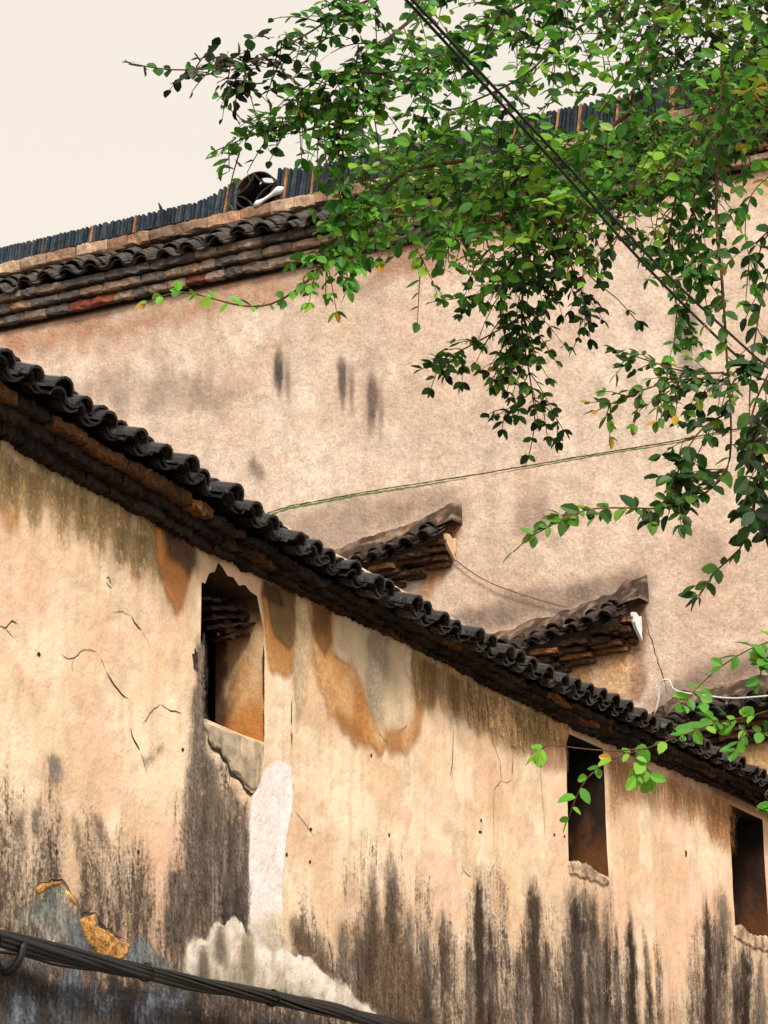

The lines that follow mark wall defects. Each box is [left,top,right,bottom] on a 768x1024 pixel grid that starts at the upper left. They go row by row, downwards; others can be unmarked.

damp [274,351,290,394]
damp [338,362,354,404]
corrosion [155,524,197,613]
crack [64,649,127,698]
corrosion [309,603,425,755]
crack [131,705,180,768]
damp [165,638,451,1024]
peeling [17,878,174,970]
damp [0,951,337,1024]
damp [465,879,496,1024]
damp [515,883,654,1024]
damp [703,894,766,1024]